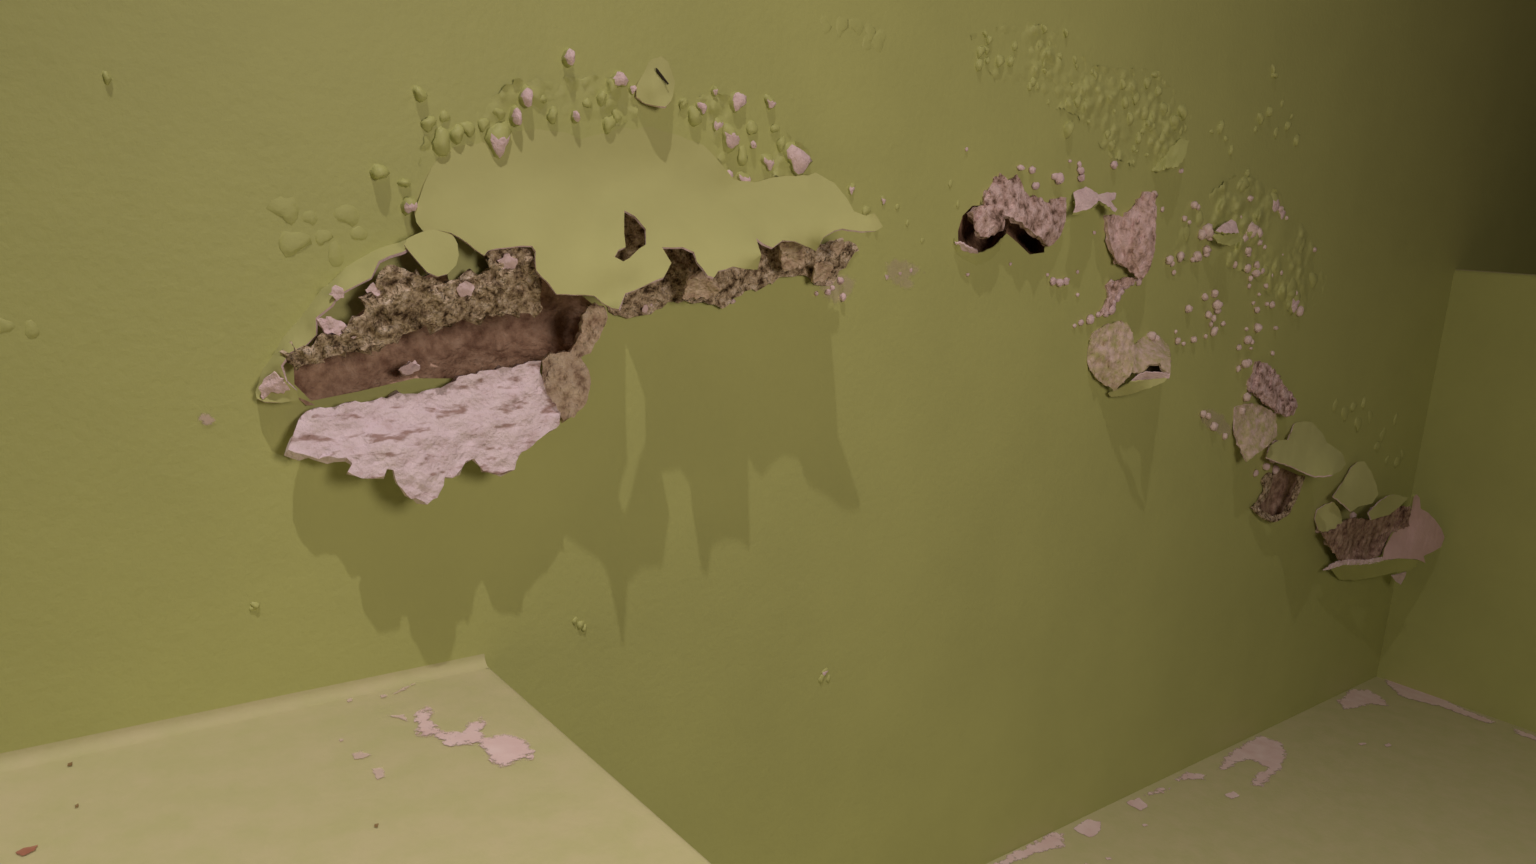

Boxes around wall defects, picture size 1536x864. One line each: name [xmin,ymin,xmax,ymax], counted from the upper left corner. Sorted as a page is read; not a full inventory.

peeling [636,56,675,108]
flaking render [948,160,1158,328]
flaking render [256,127,883,505]
flaking render [1233,361,1444,585]
flaking render [391,706,535,767]
flaking render [1127,736,1287,827]
flaking render [994,819,1101,864]